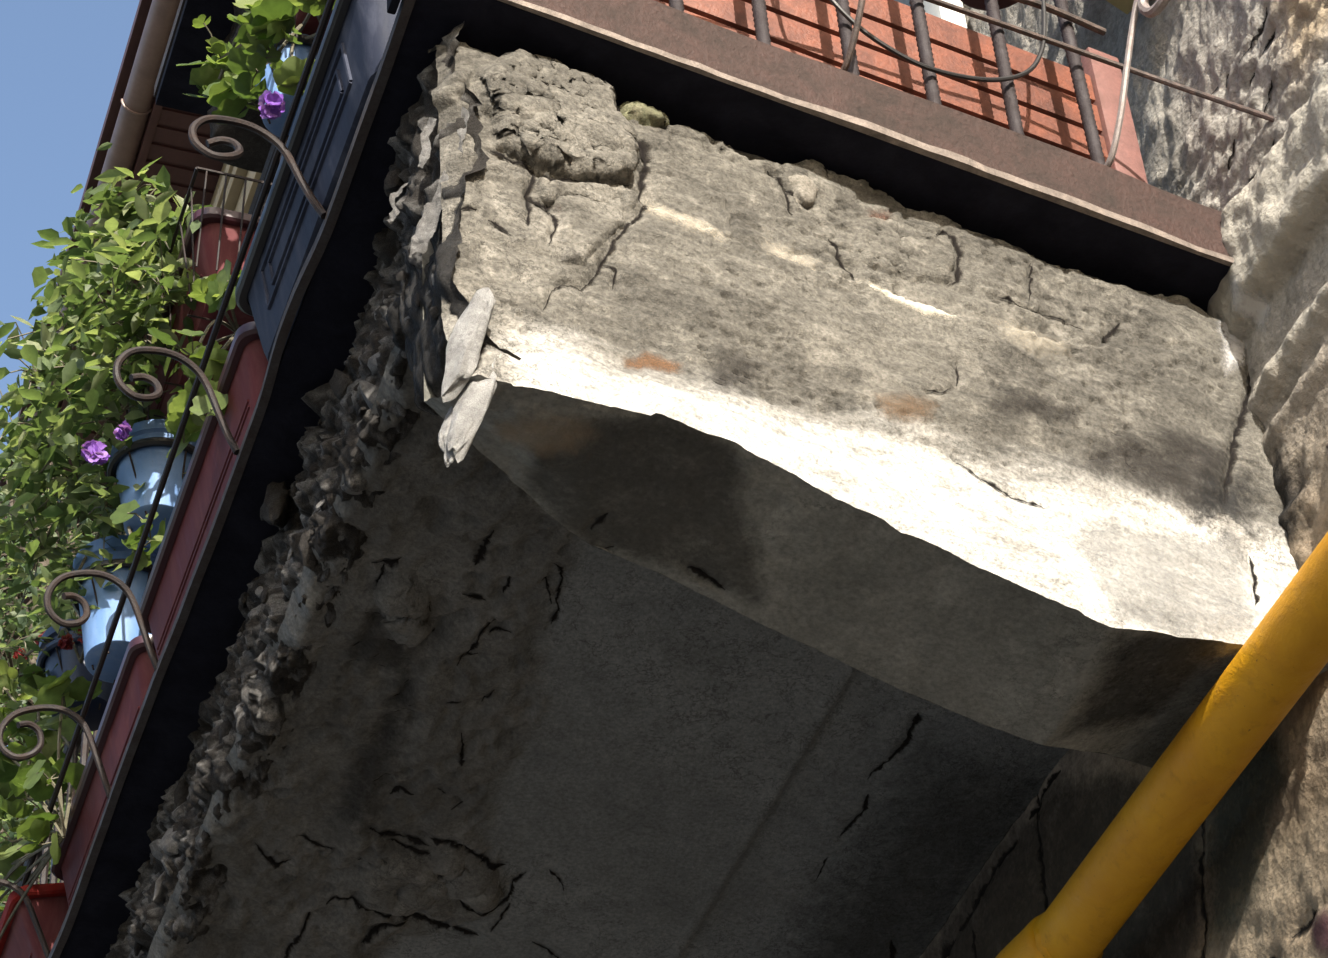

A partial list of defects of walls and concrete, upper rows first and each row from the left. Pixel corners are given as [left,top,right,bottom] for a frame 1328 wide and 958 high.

crack [452,151,580,244]
crack [543,106,651,310]
crack [828,239,854,280]
crack [936,230,963,285]
crack [999,263,1083,330]
water stain [1231,281,1269,327]
rust [628,356,674,370]
water stain [1222,322,1245,365]
spalling [105,22,522,958]
crack [956,463,1045,509]
water stain [1089,435,1250,533]
crack [255,690,564,958]